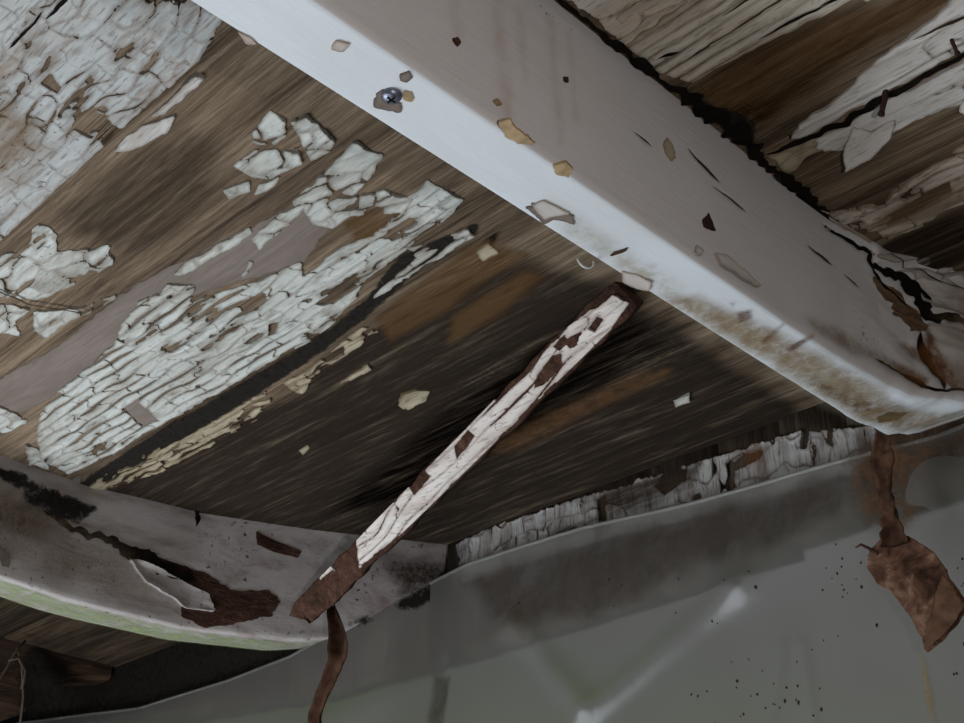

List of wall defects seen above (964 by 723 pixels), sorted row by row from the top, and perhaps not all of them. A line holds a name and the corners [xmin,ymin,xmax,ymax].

spalling [499,117,535,144]
peeling [567,0,851,83]
peeling [763,0,964,174]
peeling [0,0,498,474]
peeling [526,200,575,225]
peeling [621,271,652,291]
spalling [702,213,716,231]
crack [558,0,964,392]
peeling [821,144,964,389]
peeling [88,391,271,490]
leakage [0,468,97,561]
peeling [456,412,964,653]